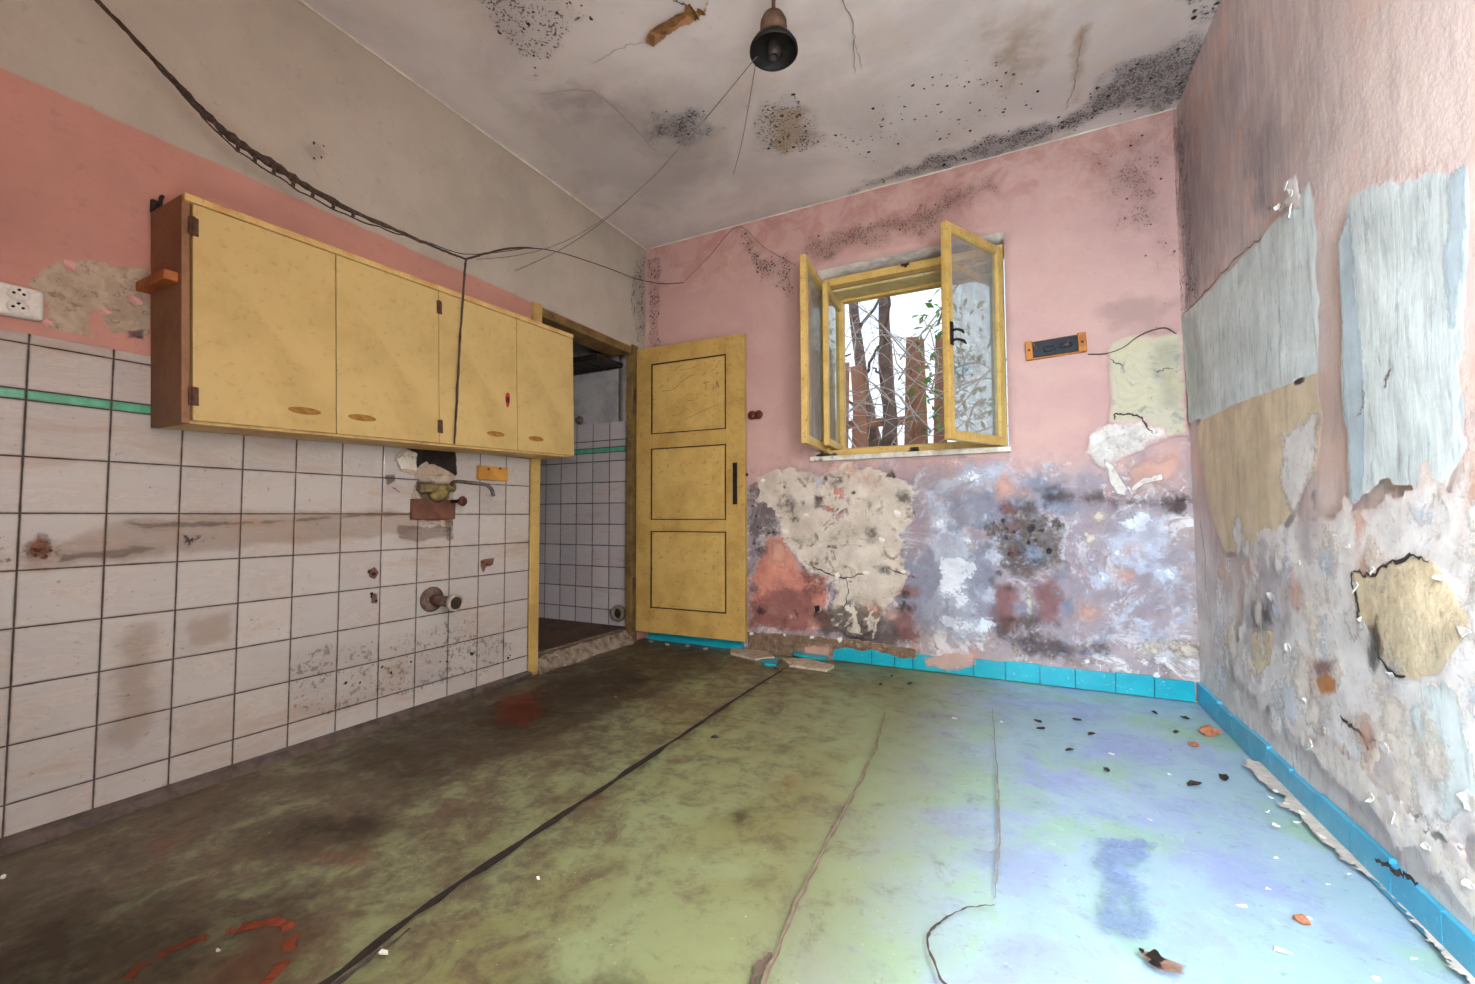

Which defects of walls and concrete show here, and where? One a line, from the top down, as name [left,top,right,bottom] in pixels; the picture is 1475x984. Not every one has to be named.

water stain [478,0,593,76]
water stain [741,0,1220,310]
flaking render [25,258,151,339]
peeling [385,448,457,500]
water stain [747,481,796,555]
flaking render [747,461,973,669]
water stain [801,561,919,645]
water stain [935,467,1153,656]
flaking render [1083,417,1169,497]
flaking render [1215,459,1475,855]
crack [926,708,1001,984]
peeling [1241,759,1475,984]